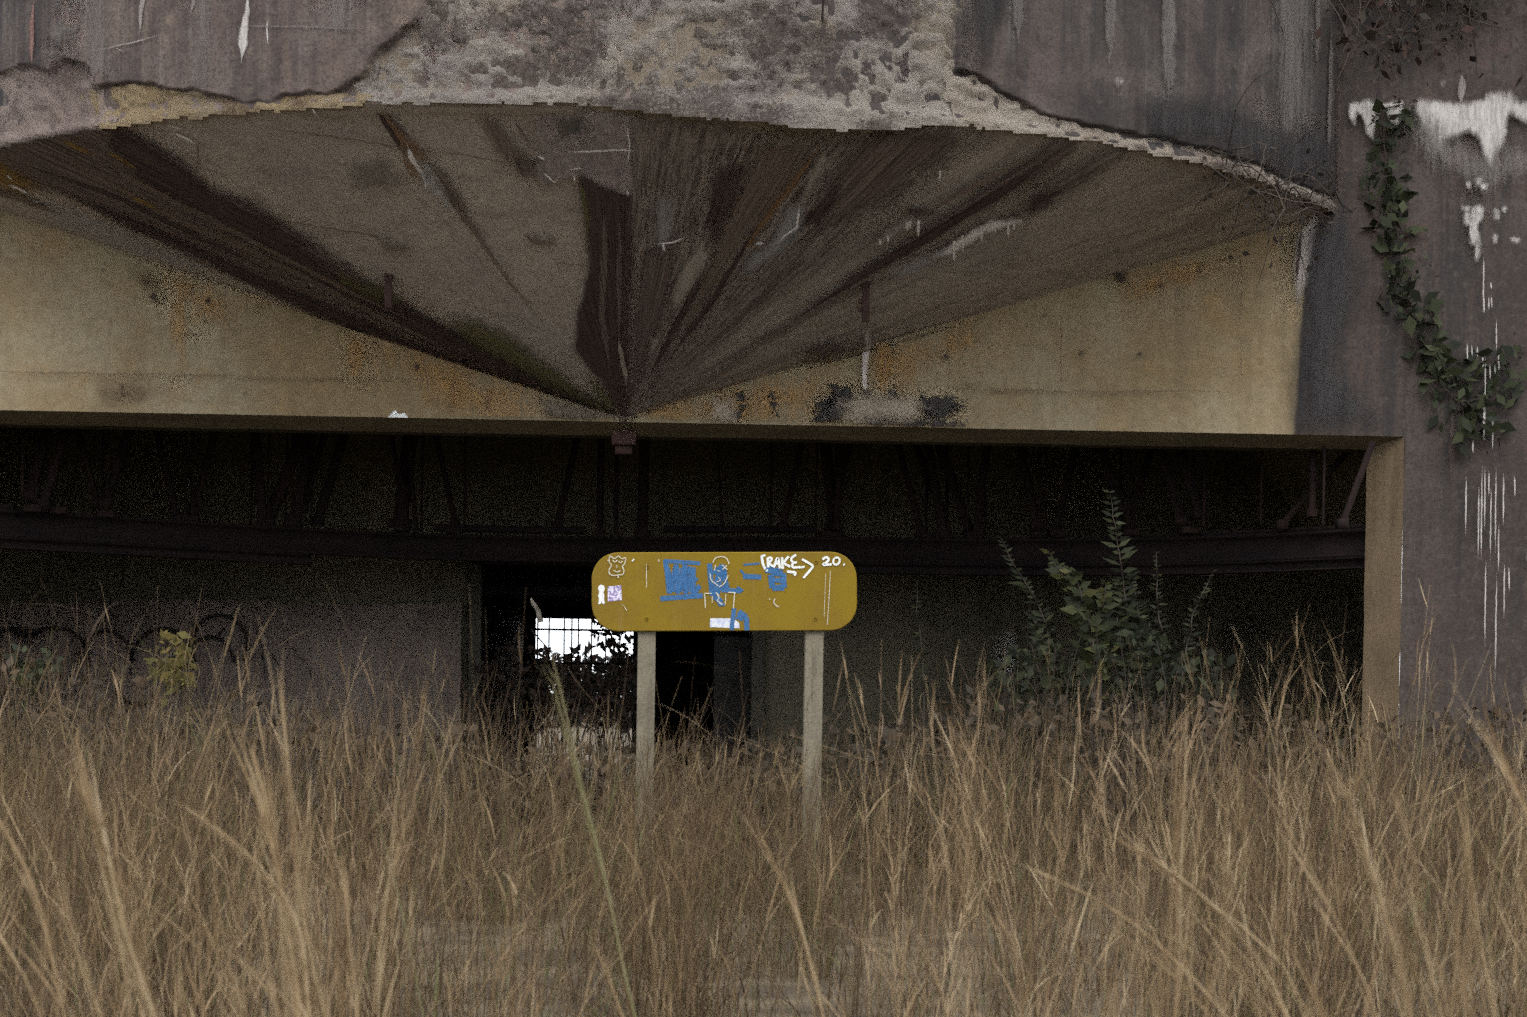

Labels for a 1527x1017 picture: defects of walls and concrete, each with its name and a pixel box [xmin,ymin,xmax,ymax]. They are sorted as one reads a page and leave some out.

efflorescence [239,0,250,63]
spalling [0,0,1338,214]
efflorescence [1467,263,1500,450]
efflorescence [1465,473,1516,668]